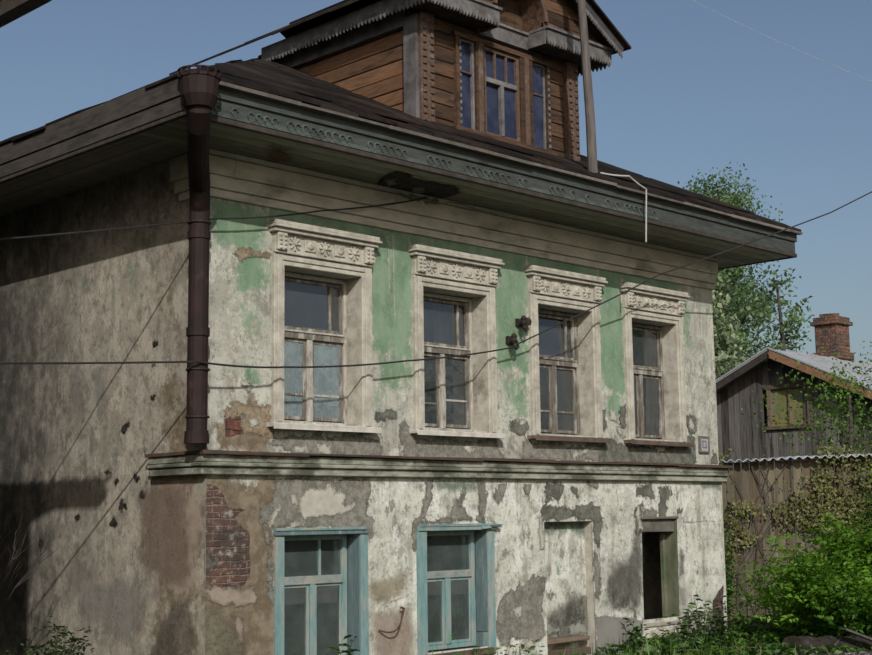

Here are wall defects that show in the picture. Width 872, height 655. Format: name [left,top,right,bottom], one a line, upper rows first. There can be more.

peeling [233,246,271,262]
peeling [223,378,382,455]
peeling [374,409,504,458]
peeling [133,473,187,583]
peeling [204,476,376,648]
peeling [411,479,507,552]
peeling [536,481,603,600]
peeling [634,483,683,534]
peeling [496,574,547,651]
spalling [680,586,724,644]